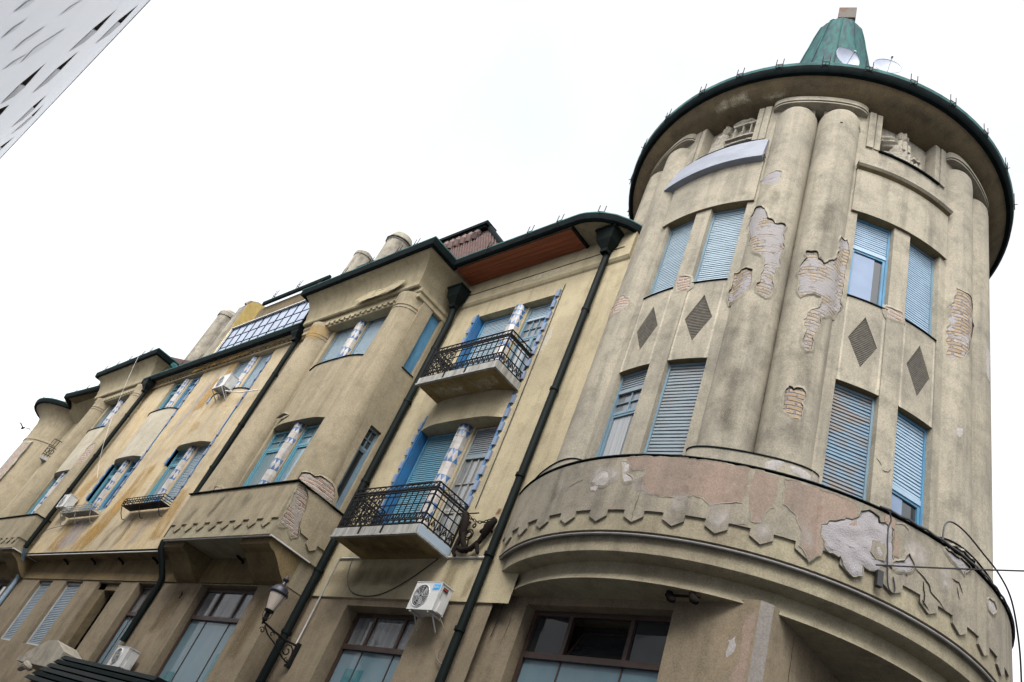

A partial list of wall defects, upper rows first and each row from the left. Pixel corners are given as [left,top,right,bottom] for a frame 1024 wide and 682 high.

flaking render [726,205,853,354]
flaking render [942,287,991,385]
flaking render [778,385,810,423]
flaking render [276,471,338,541]
peeling [590,455,917,578]
flaking render [942,543,976,578]